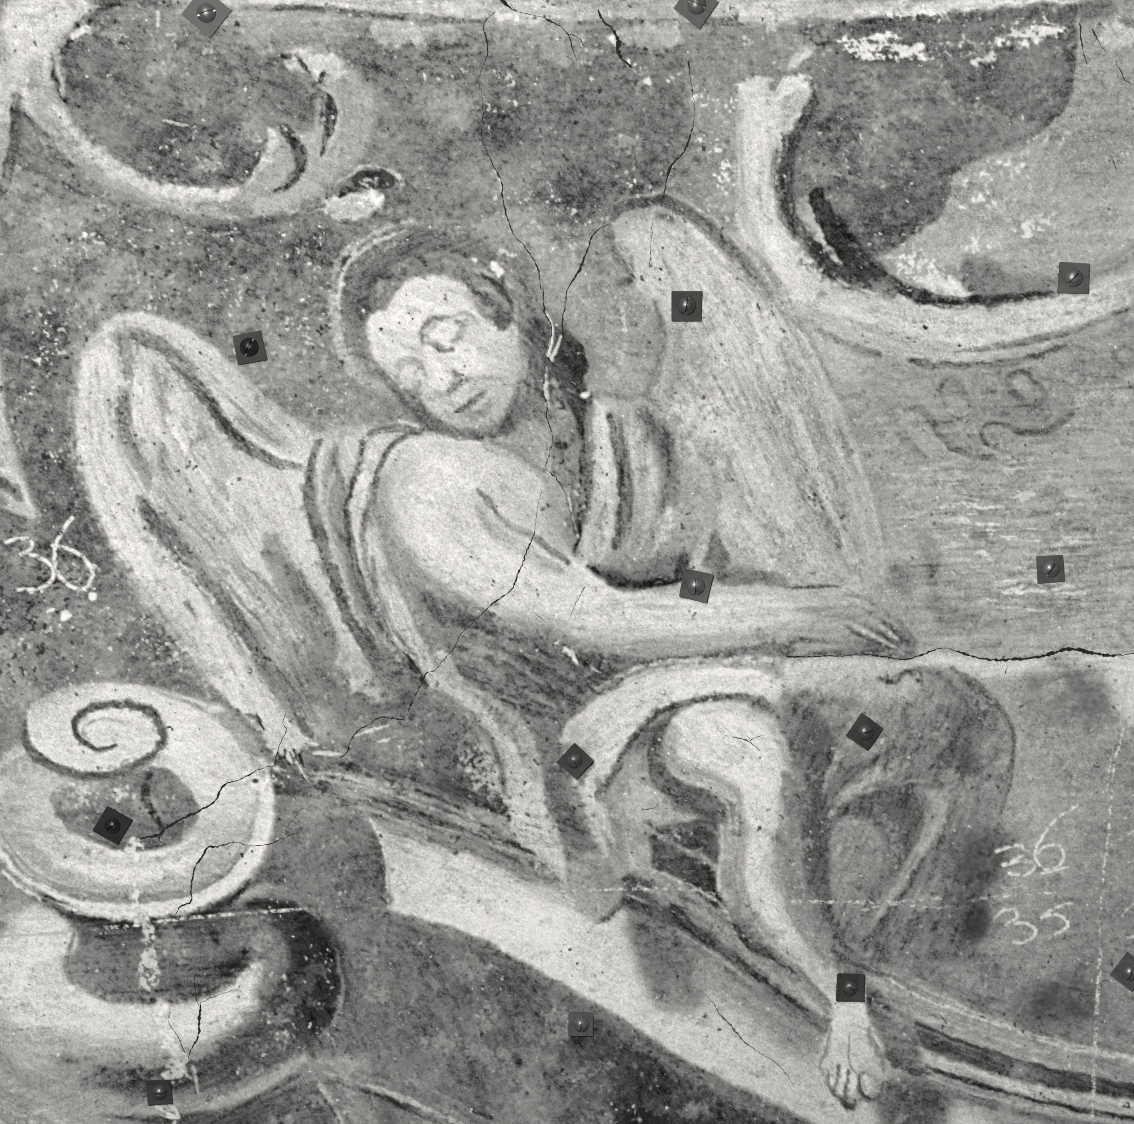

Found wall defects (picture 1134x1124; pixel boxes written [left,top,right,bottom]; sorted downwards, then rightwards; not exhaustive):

crack [339,0,695,758]
crack [786,647,1134,673]
crack [140,712,287,845]
crack [176,807,310,913]
crack [153,977,233,1058]